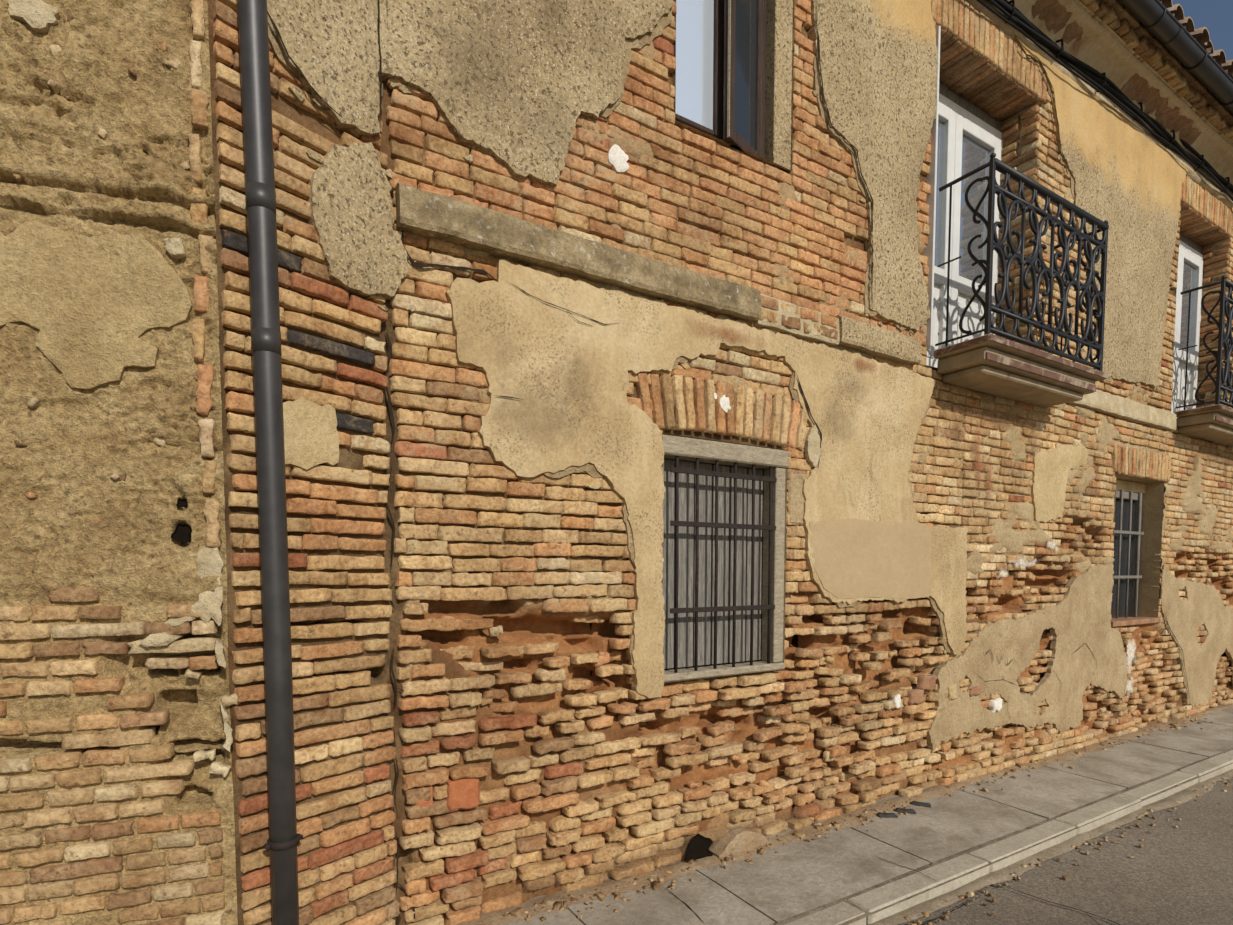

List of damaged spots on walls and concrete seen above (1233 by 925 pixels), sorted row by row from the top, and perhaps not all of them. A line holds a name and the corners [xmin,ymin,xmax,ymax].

peeling [267,0,674,311]
spalling [127,632,226,680]
spalling [193,693,239,778]
peeling [397,259,1233,815]